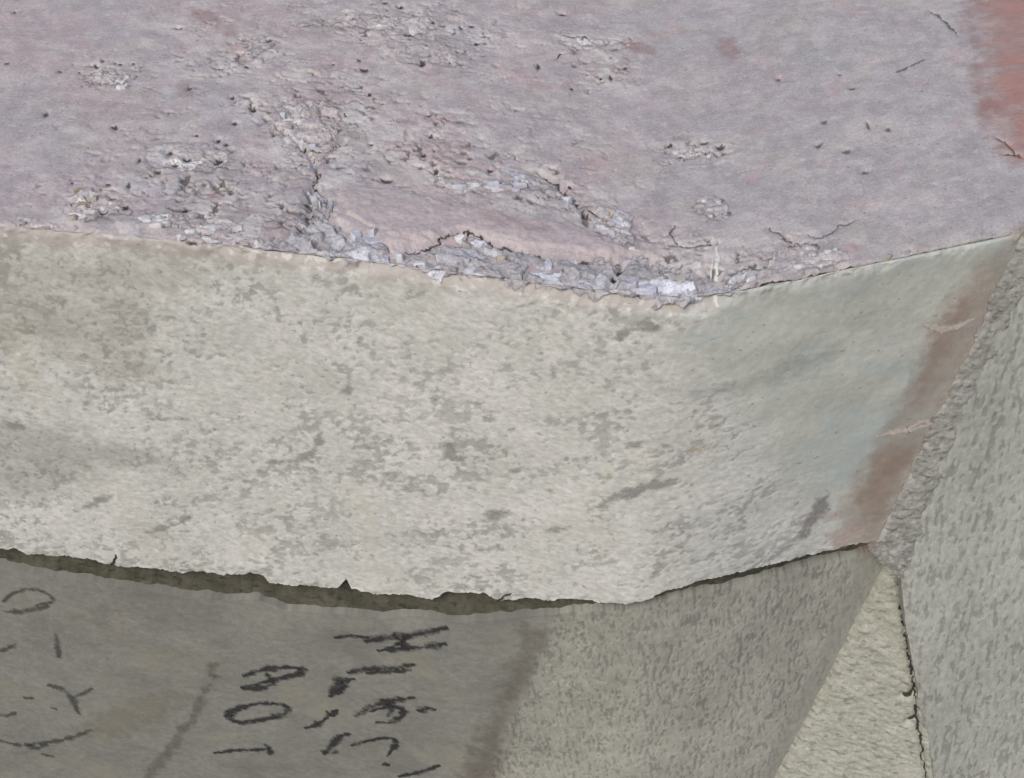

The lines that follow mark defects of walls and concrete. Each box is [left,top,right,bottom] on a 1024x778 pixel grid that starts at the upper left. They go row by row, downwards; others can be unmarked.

spalling [137,135,229,175]
crack [287,103,347,221]
spalling [667,143,725,163]
spalling [12,168,850,310]
crack [897,583,927,778]